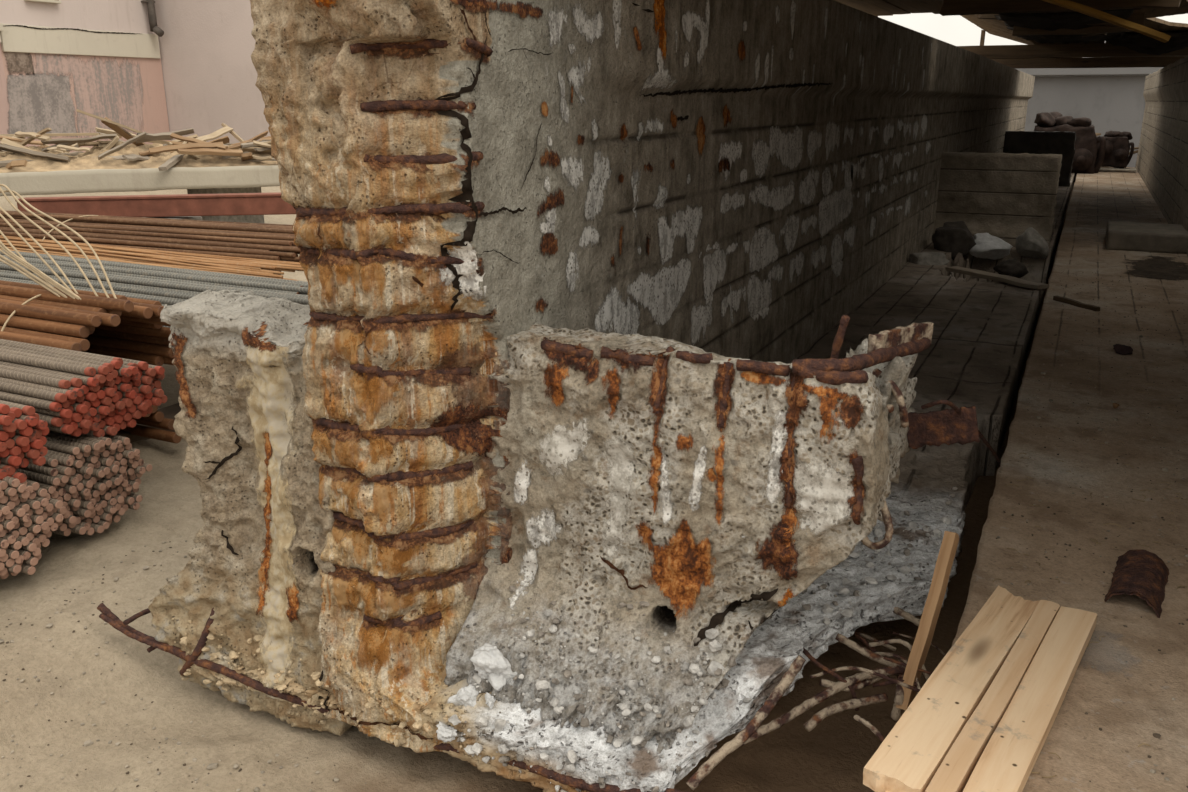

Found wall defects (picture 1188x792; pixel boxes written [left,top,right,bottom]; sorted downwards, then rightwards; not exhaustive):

crack [436,7,552,311]
efflorescence [595,114,931,345]
crack [205,427,242,480]
spalling [97,603,358,727]
rust [303,310,513,673]
efflorescence [508,509,561,610]
efflorescence [514,418,591,505]
rust [543,337,716,618]
spalling [540,315,869,428]
crack [694,588,778,646]
rust [706,359,865,607]
spalling [664,607,946,792]